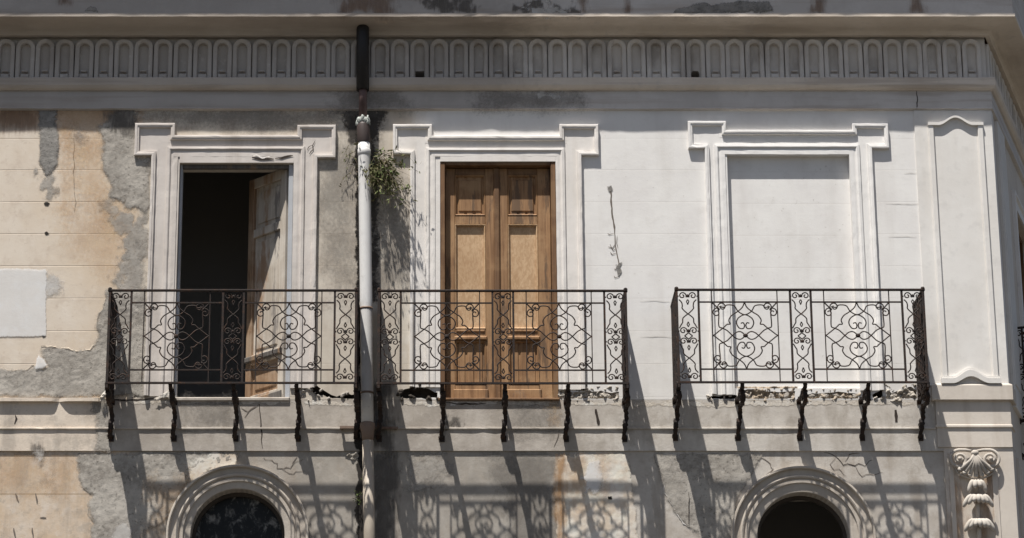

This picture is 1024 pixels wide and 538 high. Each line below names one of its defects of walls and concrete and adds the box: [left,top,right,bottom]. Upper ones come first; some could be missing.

flaking render [0,110,238,538]
spalling [299,386,354,401]
spalling [558,385,619,402]
spalling [706,384,917,402]
crack [242,404,302,474]
crack [824,452,882,477]